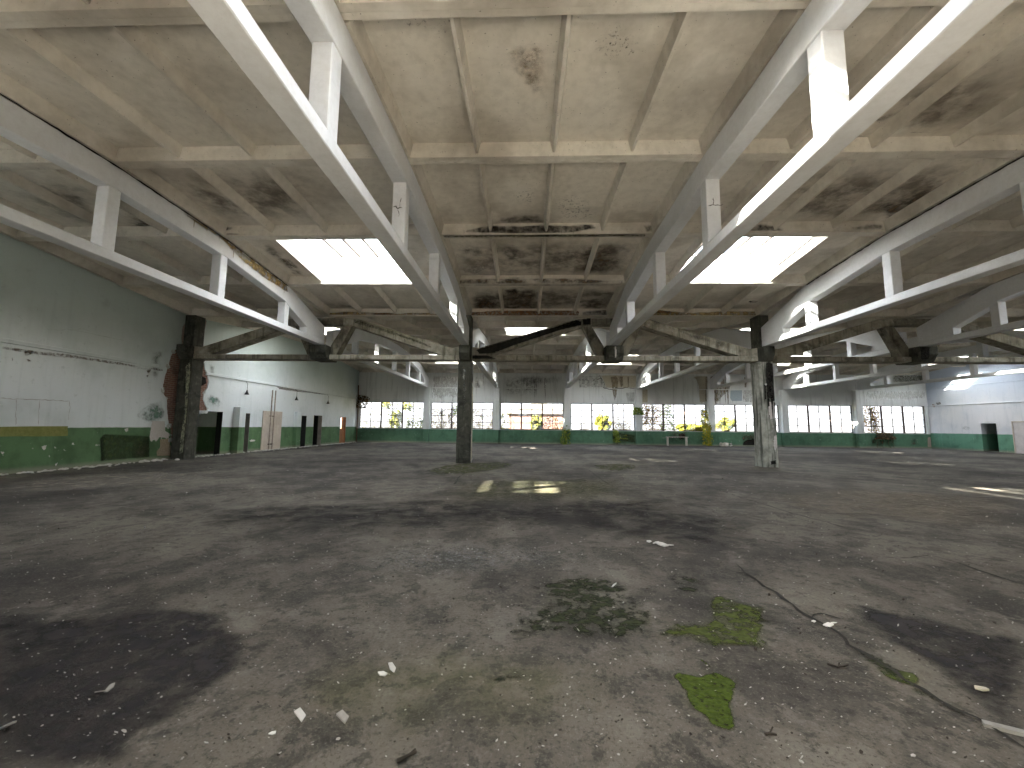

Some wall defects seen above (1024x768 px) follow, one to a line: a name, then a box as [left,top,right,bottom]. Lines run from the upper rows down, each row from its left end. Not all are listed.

water stain [869,179,933,216]
water stain [445,199,651,359]
flaking render [199,361,211,414]
crack [889,555,1024,585]
crack [732,565,1024,748]